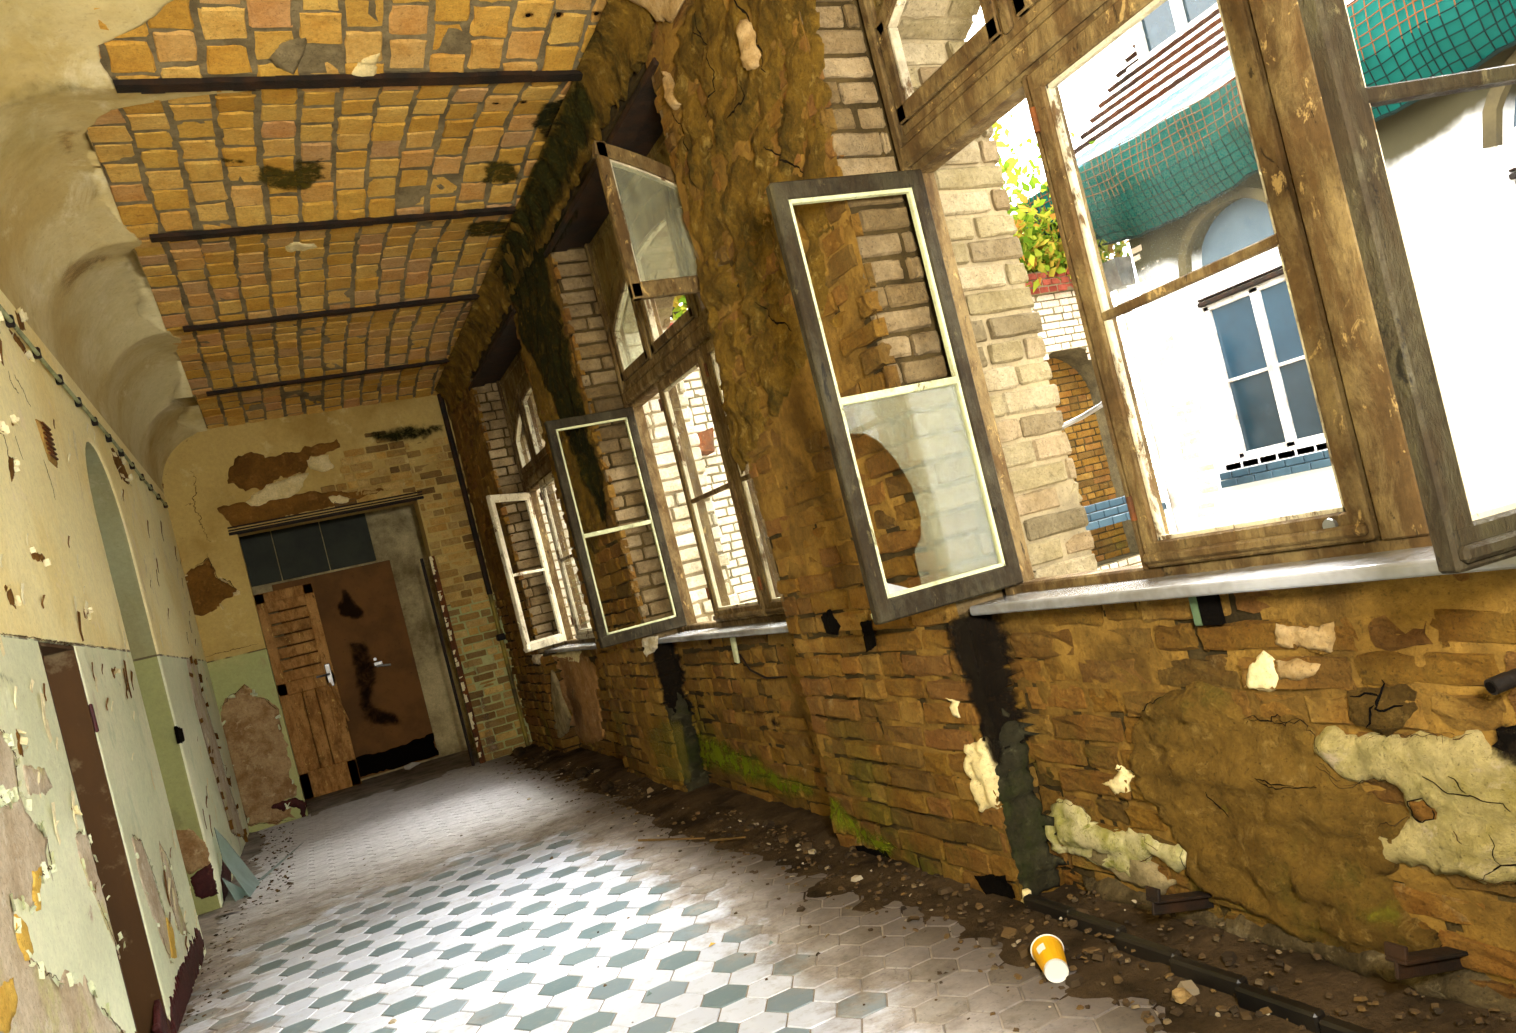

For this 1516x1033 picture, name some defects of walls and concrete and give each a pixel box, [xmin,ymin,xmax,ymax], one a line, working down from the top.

water stain [259,158,324,190]
flaking render [87,0,608,429]
spalling [510,250,602,565]
spalling [8,456,20,482]
spalling [217,439,387,528]
spalling [4,584,22,609]
spalling [29,547,52,567]
spalling [184,558,240,618]
spalling [174,726,185,744]
spalling [186,655,297,842]
flaking render [1103,622,1442,954]
peeling [0,729,126,1033]